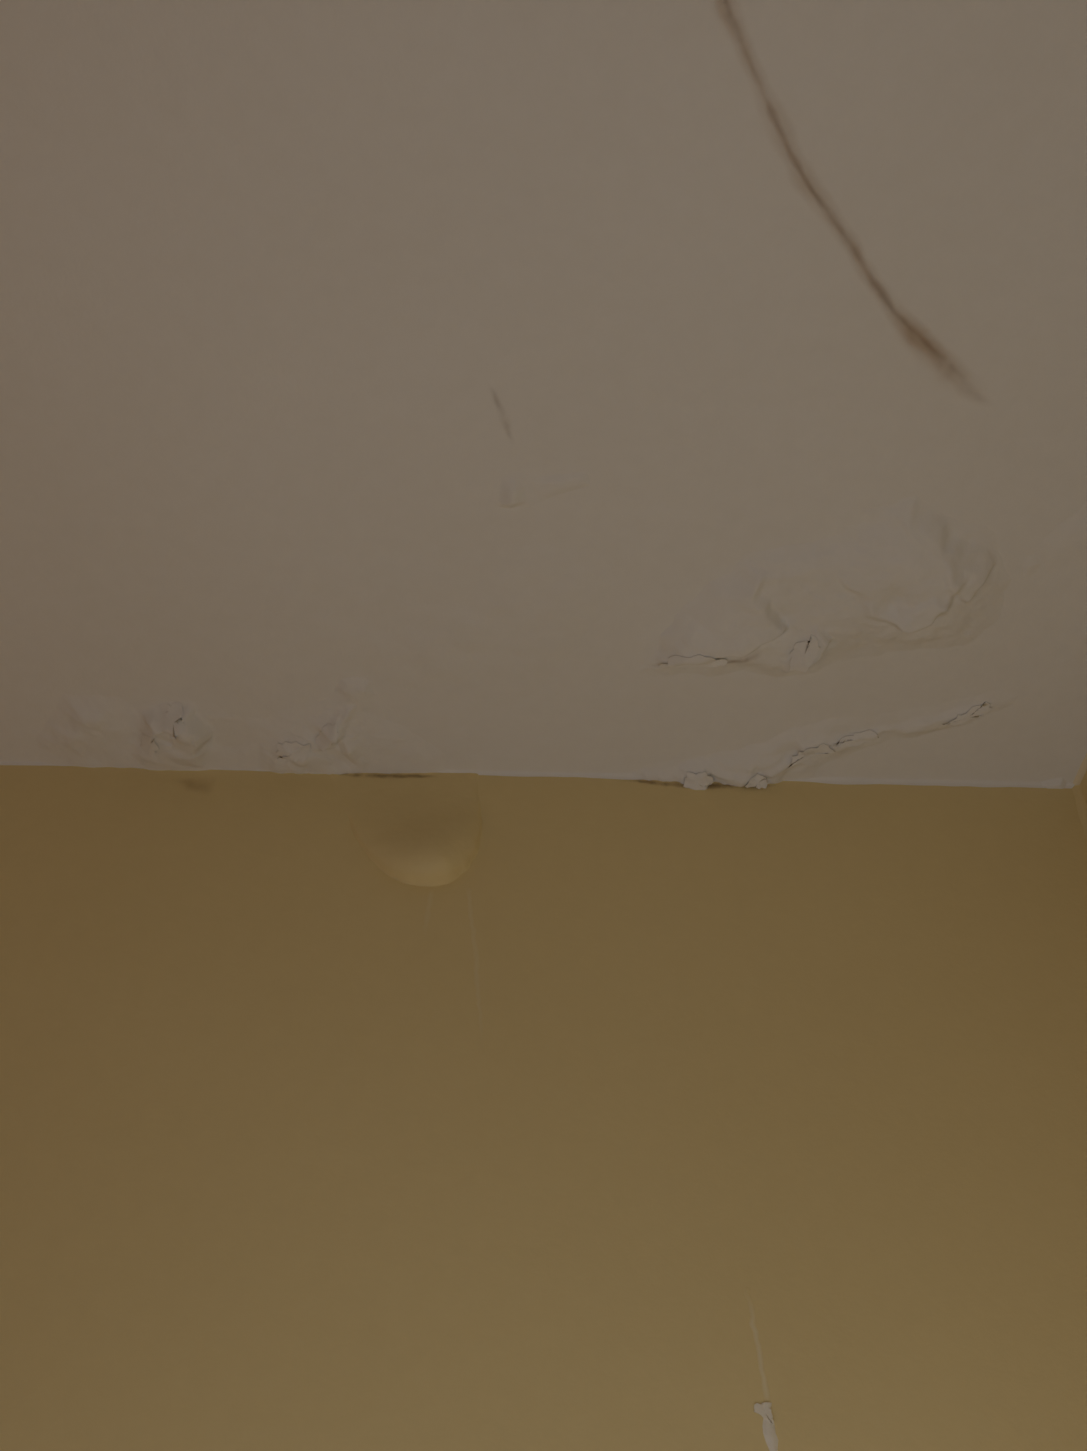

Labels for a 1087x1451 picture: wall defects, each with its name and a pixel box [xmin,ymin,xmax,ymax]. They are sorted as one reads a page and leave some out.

spalling [36,677,447,775]
peeling [632,689,1018,790]
crack [744,1288,778,1451]